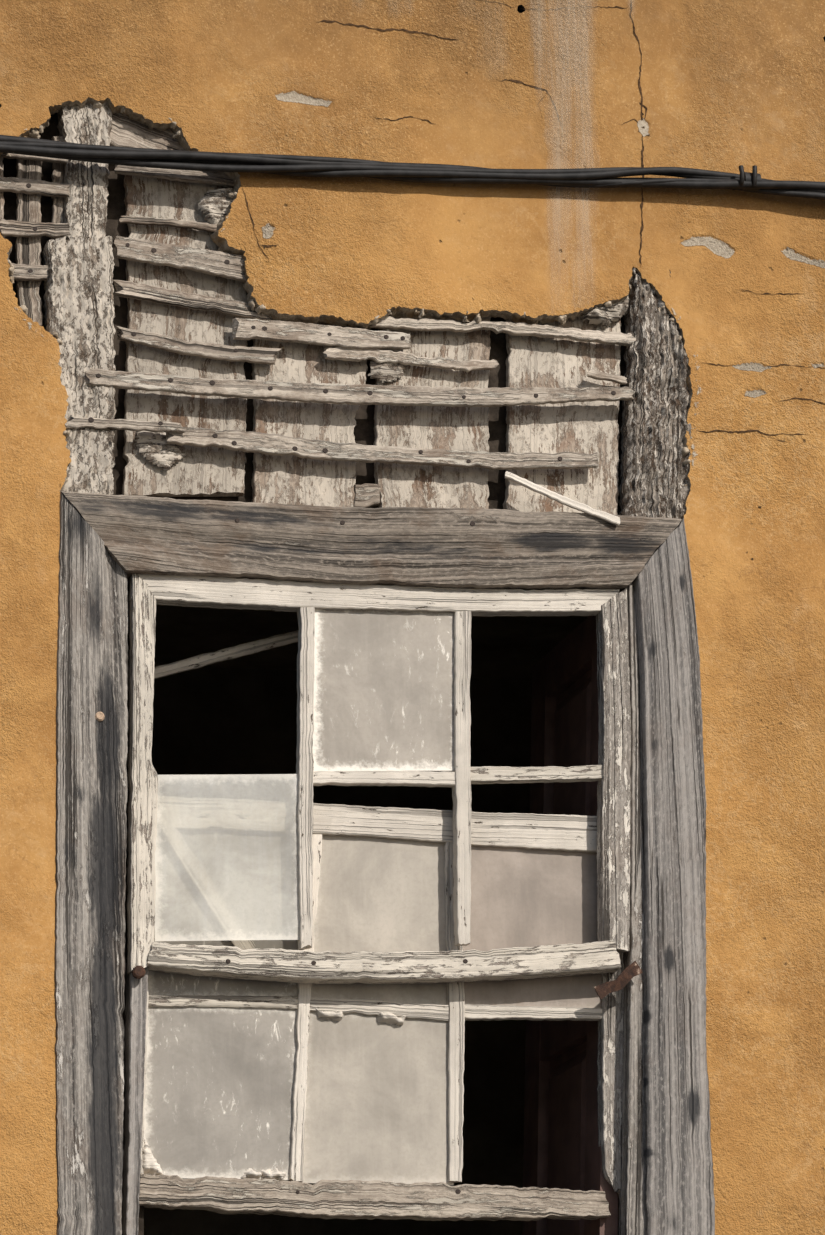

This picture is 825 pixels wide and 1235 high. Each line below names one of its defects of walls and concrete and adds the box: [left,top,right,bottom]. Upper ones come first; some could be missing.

crack [316,20,457,40]
peeling [276,91,332,107]
spalling [19,97,198,151]
crack [479,0,648,268]
peeling [637,118,650,137]
peeling [681,236,734,258]
peeling [781,247,825,268]
spalling [7,247,32,329]
spalling [198,172,701,515]
spalling [135,431,186,470]